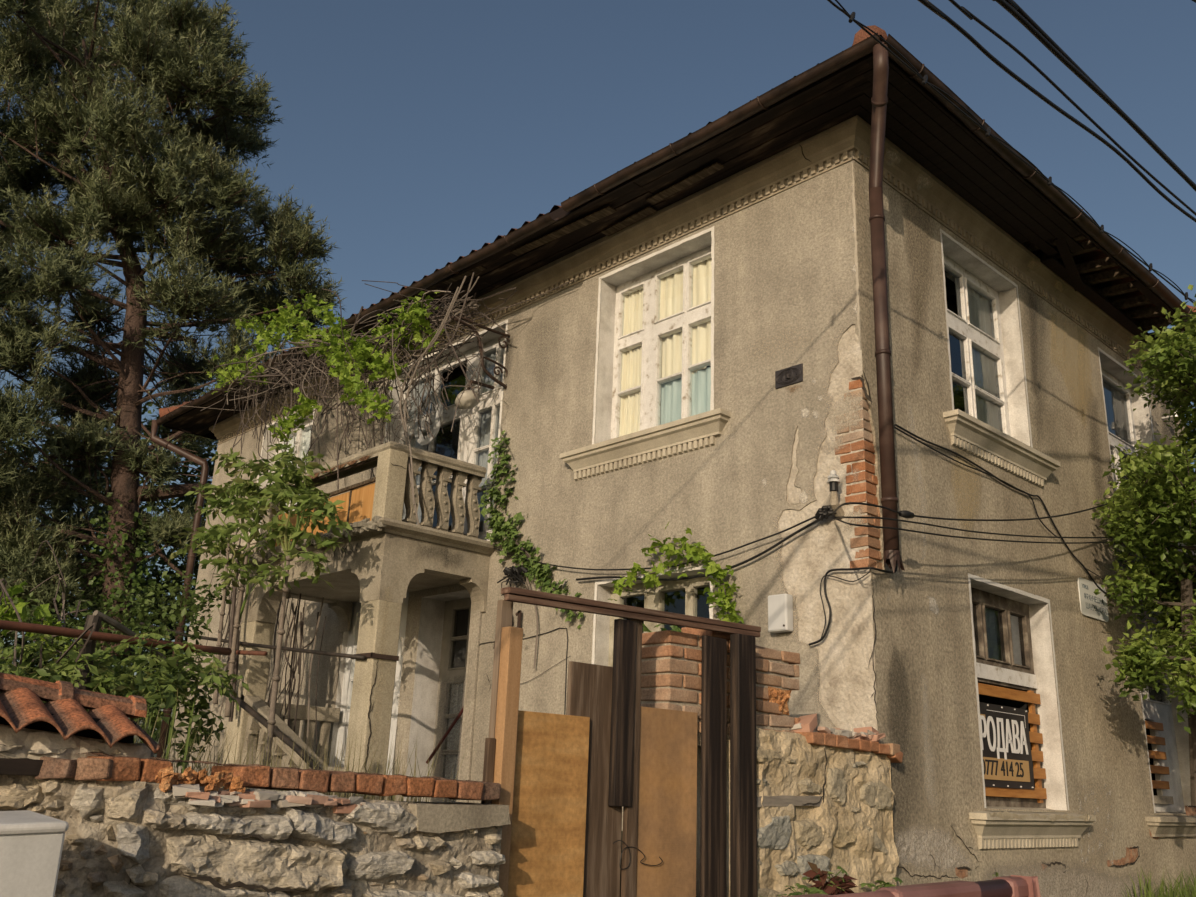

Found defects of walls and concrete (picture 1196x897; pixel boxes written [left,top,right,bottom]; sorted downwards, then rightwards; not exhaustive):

peeling [777,163,883,732]
crack [364,662,378,773]
spalling [763,686,792,715]
crack [898,825,980,879]
peeling [898,829,1150,897]